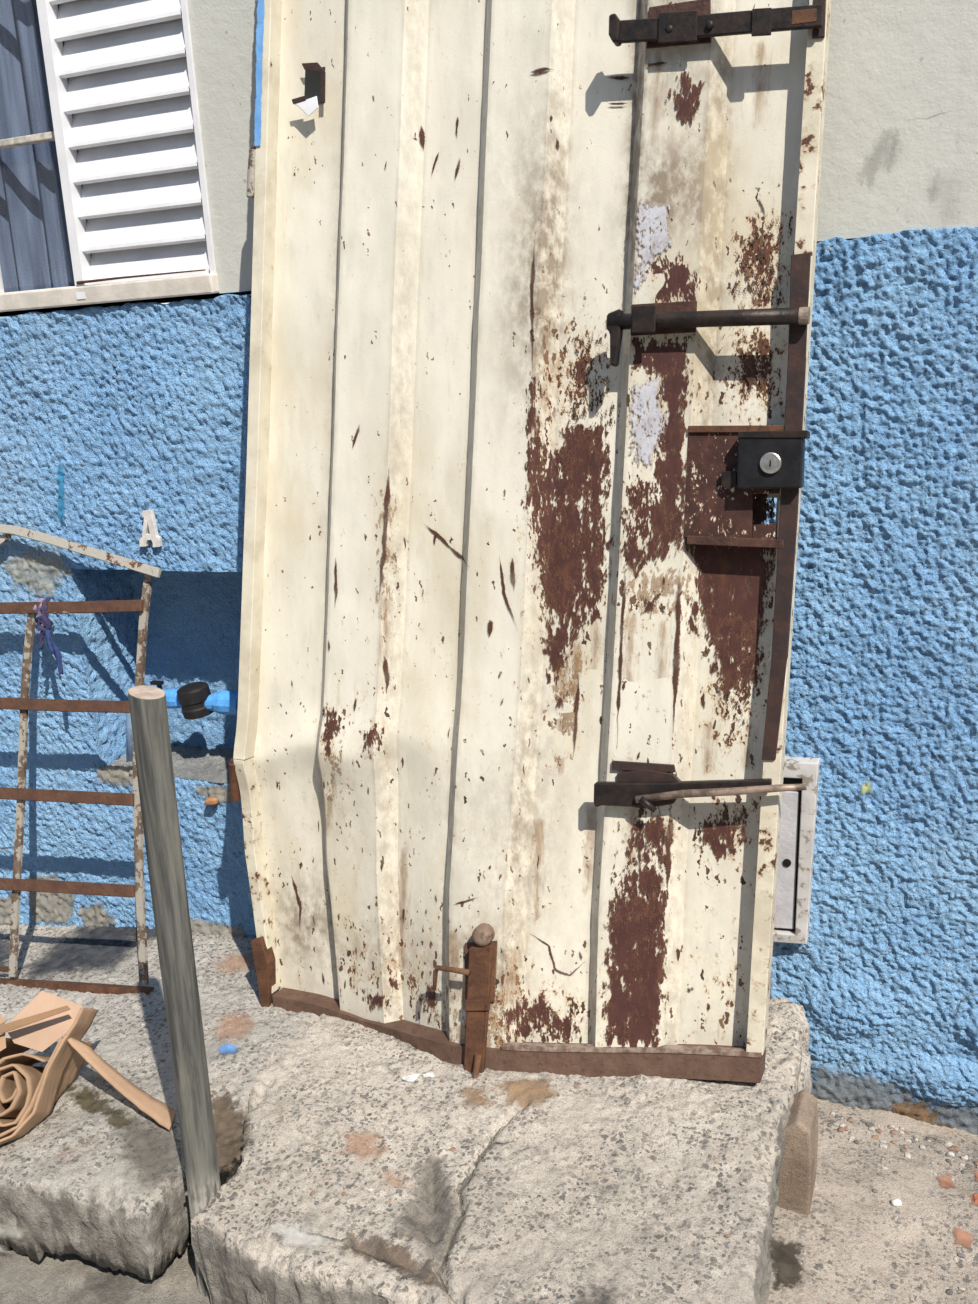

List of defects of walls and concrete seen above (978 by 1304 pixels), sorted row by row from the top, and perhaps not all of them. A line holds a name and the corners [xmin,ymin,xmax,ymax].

crack [278,1108,525,1301]